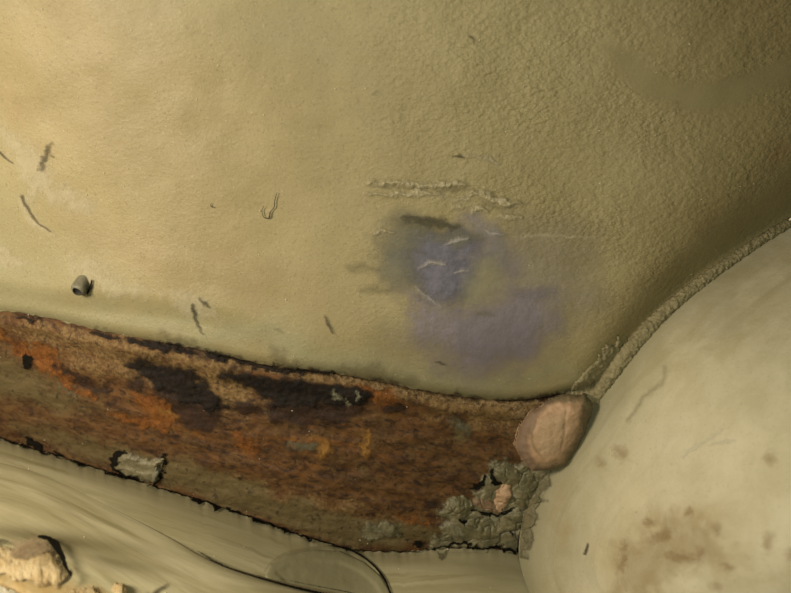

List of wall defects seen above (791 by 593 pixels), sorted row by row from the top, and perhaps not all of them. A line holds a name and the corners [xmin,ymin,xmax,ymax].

peeling [367,179,523,220]
rust [0,311,563,553]
peeling [0,535,99,593]